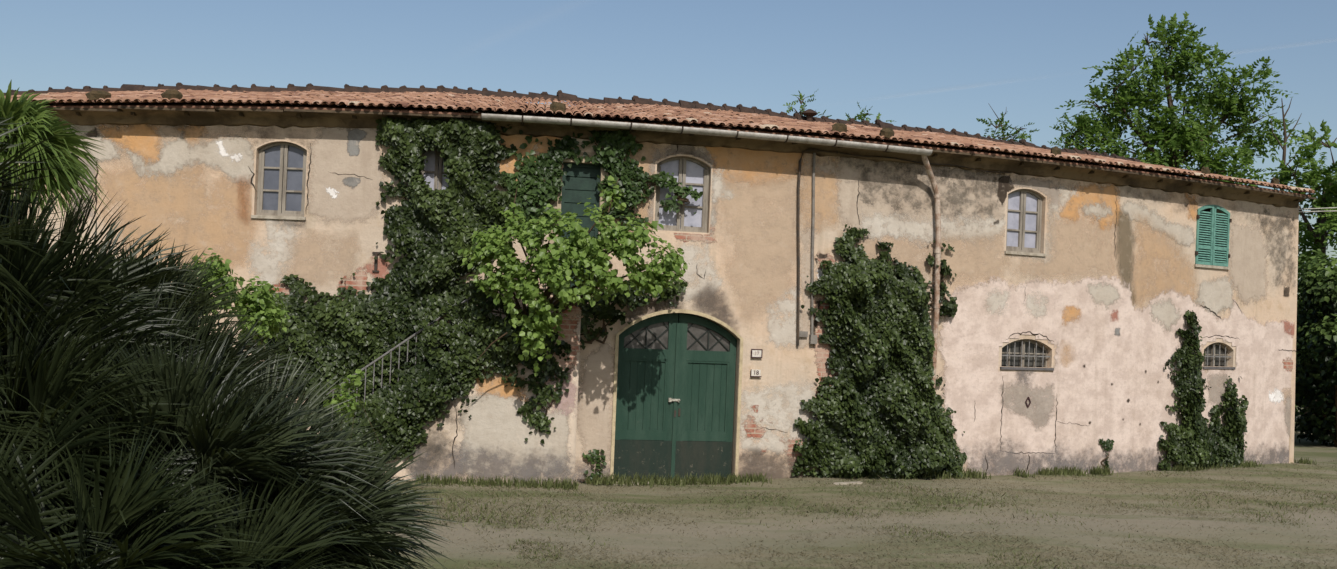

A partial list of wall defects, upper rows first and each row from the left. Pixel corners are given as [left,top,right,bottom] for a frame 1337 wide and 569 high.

peeling [63,124,297,300]
flaking render [307,126,387,223]
flaking render [339,258,389,299]
flaking render [459,306,615,478]
flaking render [611,142,1295,475]